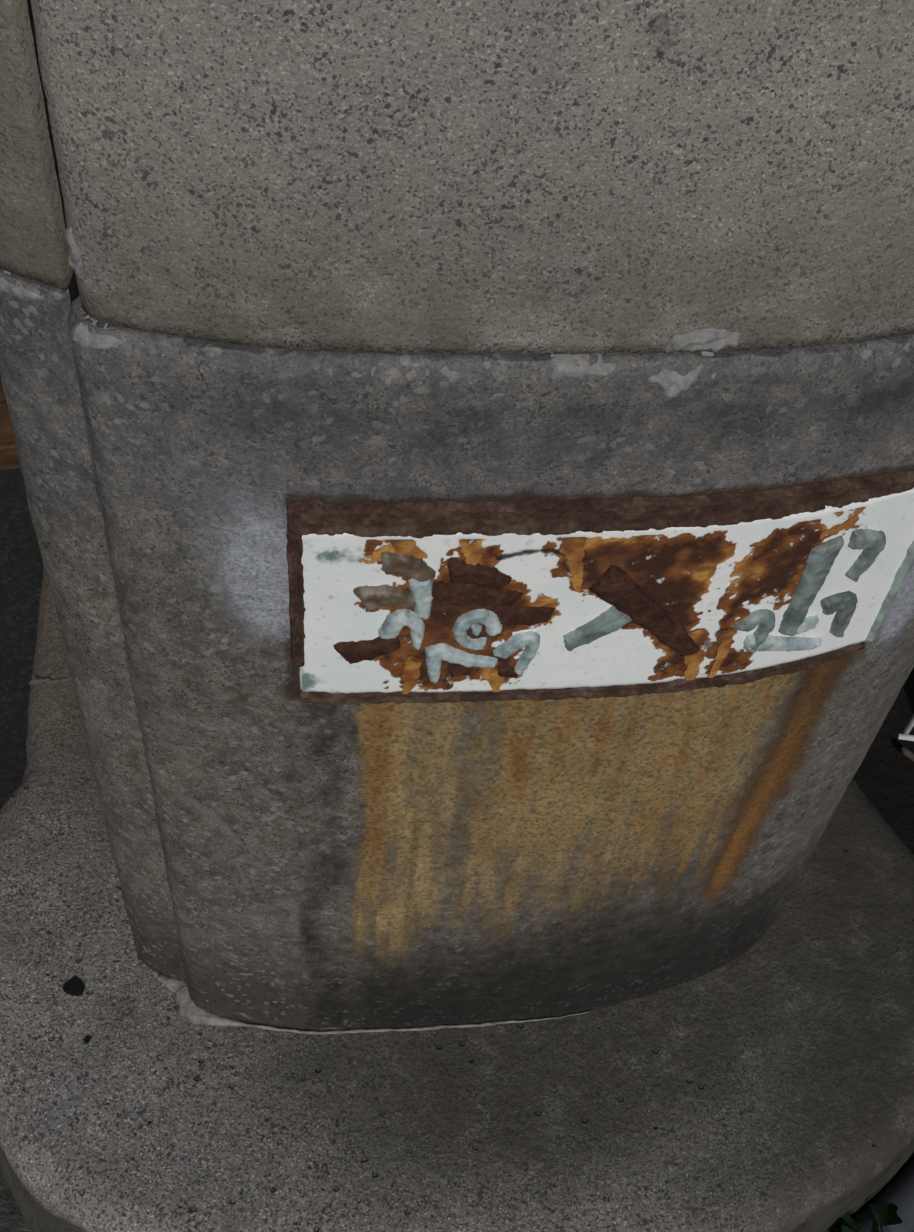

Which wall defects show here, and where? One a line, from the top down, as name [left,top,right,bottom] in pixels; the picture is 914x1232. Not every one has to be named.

spalling [551,353,616,379]
spalling [648,328,743,401]
corrosion [353,507,866,960]